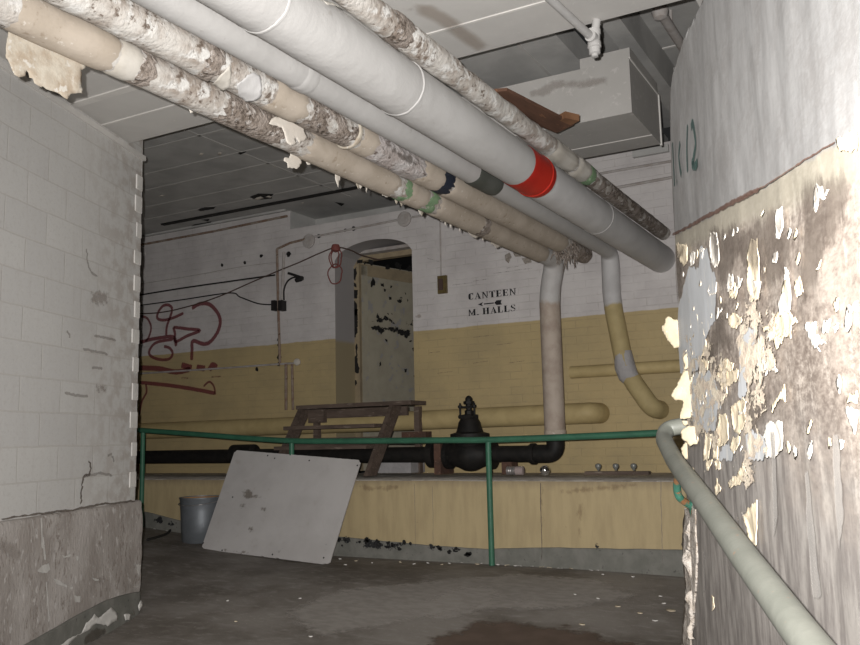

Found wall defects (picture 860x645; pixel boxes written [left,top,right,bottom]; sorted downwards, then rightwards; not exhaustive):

peeling [813,183,829,212]
peeling [774,206,798,240]
peeling [661,227,858,495]
crack [2,461,135,520]
peeling [737,499,758,546]
peeling [61,600,143,645]